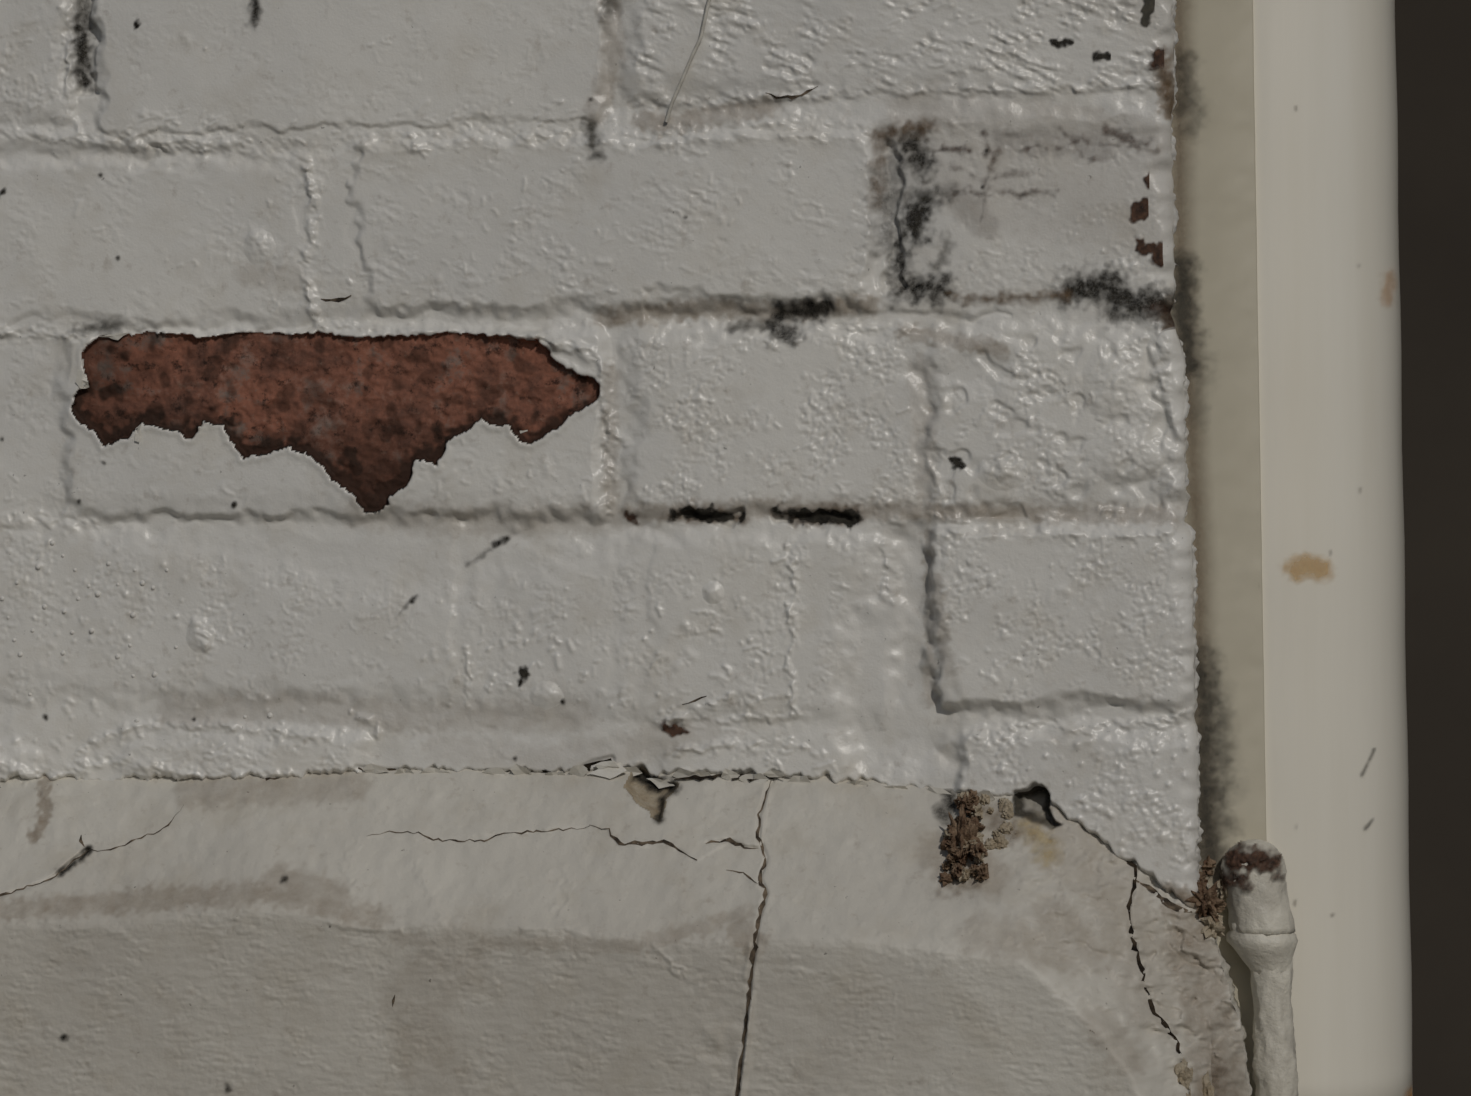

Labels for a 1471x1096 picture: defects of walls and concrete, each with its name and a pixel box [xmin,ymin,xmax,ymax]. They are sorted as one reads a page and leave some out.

leakage [876,122,970,171]
leakage [893,194,951,305]
leakage [984,258,1199,373]
peeling [71,331,599,512]
crack [0,779,182,896]
crack [846,781,995,801]
leakage [937,791,956,820]
spalling [1013,786,1054,857]
leakage [1196,651,1219,860]
crack [358,758,811,1096]
crack [1126,861,1192,1090]